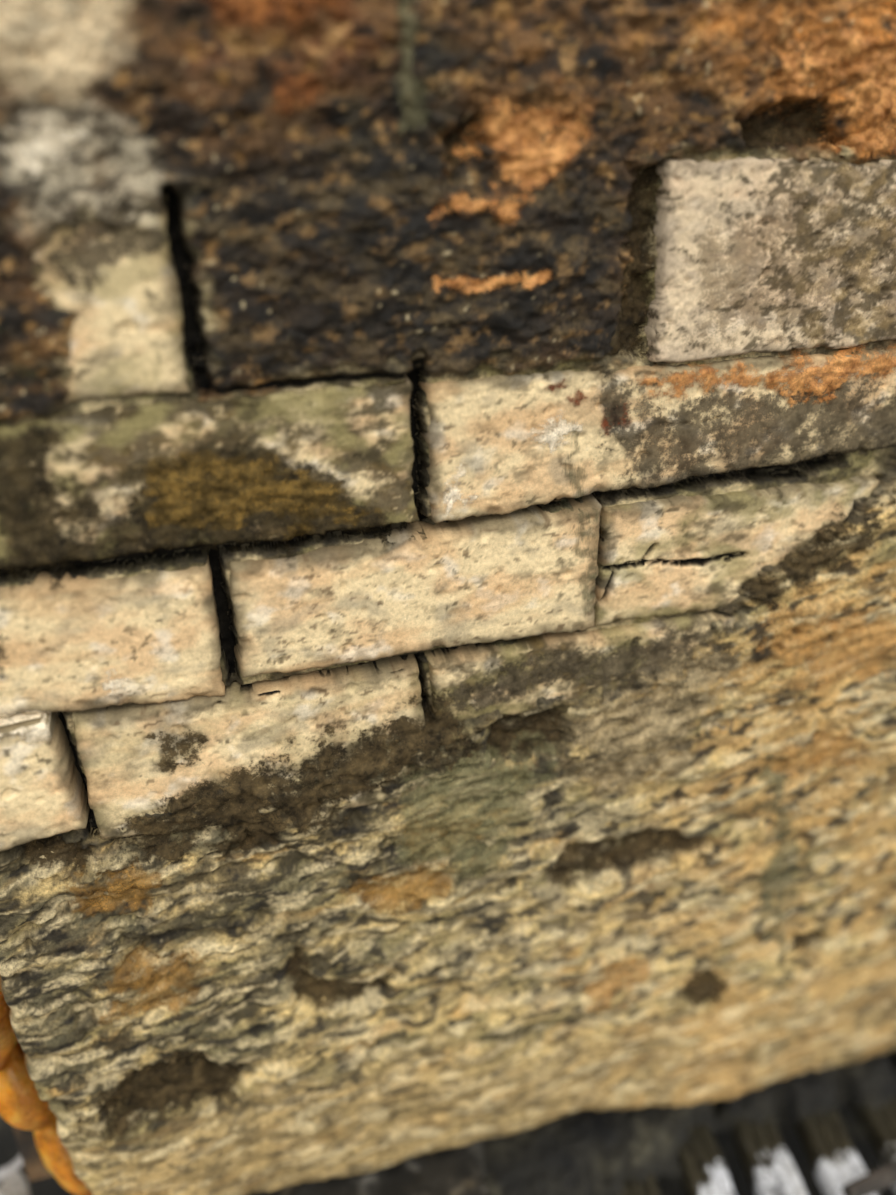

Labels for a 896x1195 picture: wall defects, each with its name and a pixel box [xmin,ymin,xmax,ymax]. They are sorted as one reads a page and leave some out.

crack [525,454,837,509]
crack [595,535,746,598]
water stain [488,636,531,647]
water stain [575,611,699,632]
water stain [220,646,369,686]
water stain [144,729,209,773]